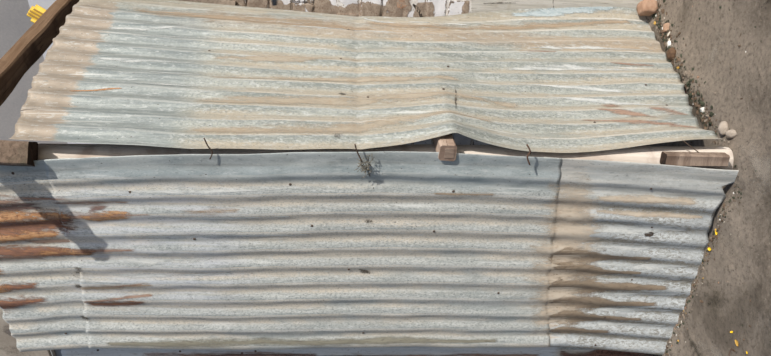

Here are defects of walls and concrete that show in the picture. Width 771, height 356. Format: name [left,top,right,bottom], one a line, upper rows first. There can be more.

spalling [233,0,434,17]
corrosion [0,195,135,259]
corrosion [0,283,44,309]
corrosion [82,284,151,306]